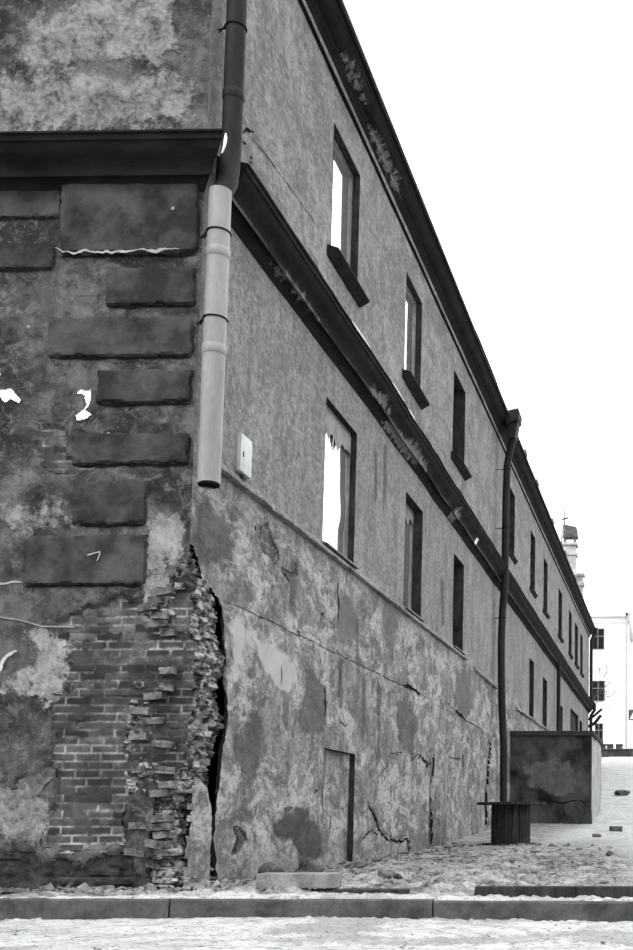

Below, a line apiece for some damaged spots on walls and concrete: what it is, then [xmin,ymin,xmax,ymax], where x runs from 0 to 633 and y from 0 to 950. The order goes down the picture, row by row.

spalling [0,389,21,403]
spalling [75,390,91,421]
spalling [255,516,298,581]
spalling [0,513,230,890]
crack [210,600,489,877]
damp [273,806,322,861]